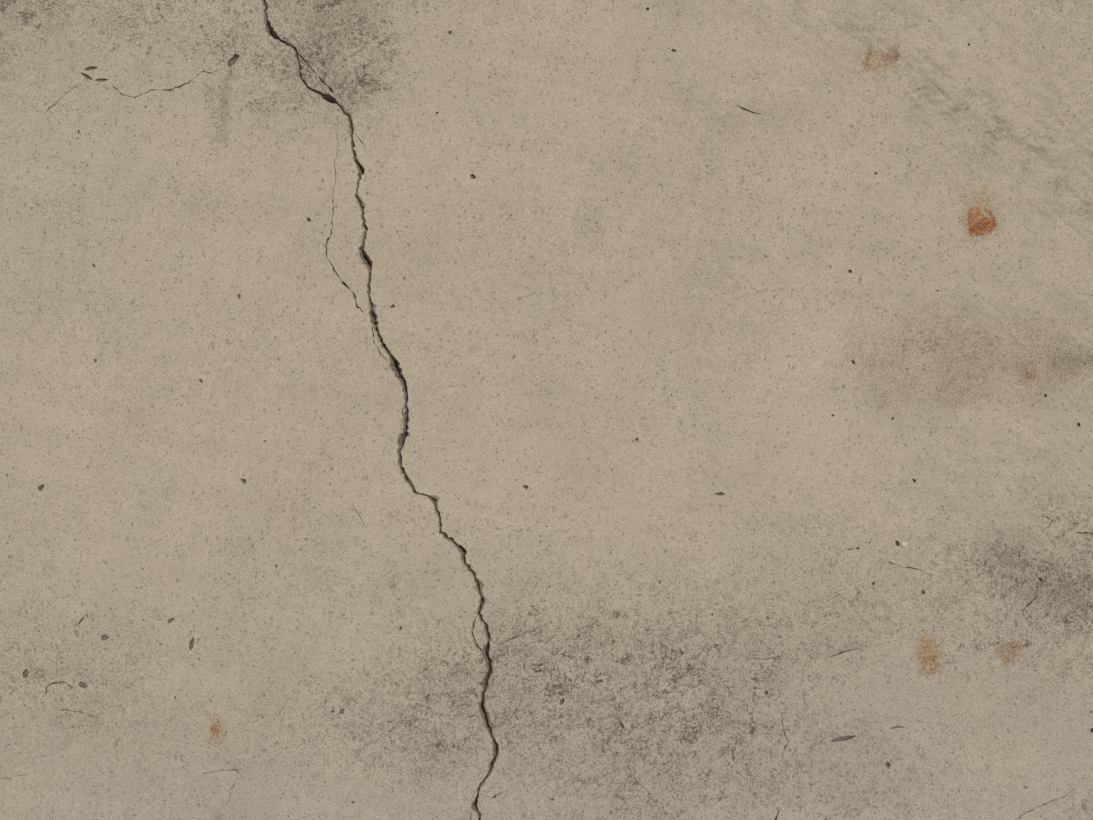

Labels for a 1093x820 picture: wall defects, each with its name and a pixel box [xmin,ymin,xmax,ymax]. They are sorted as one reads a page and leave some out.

crack [261,0,522,820]
corrosion [969,207,997,235]